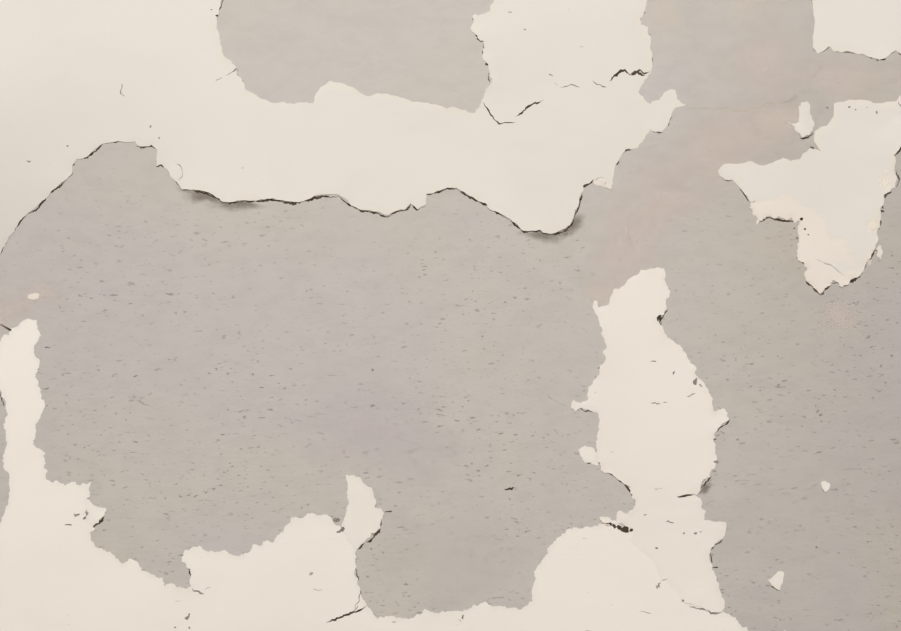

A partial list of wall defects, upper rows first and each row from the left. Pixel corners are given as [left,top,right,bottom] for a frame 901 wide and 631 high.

peeling [211,0,494,113]
peeling [0,141,643,619]
peeling [602,0,901,631]